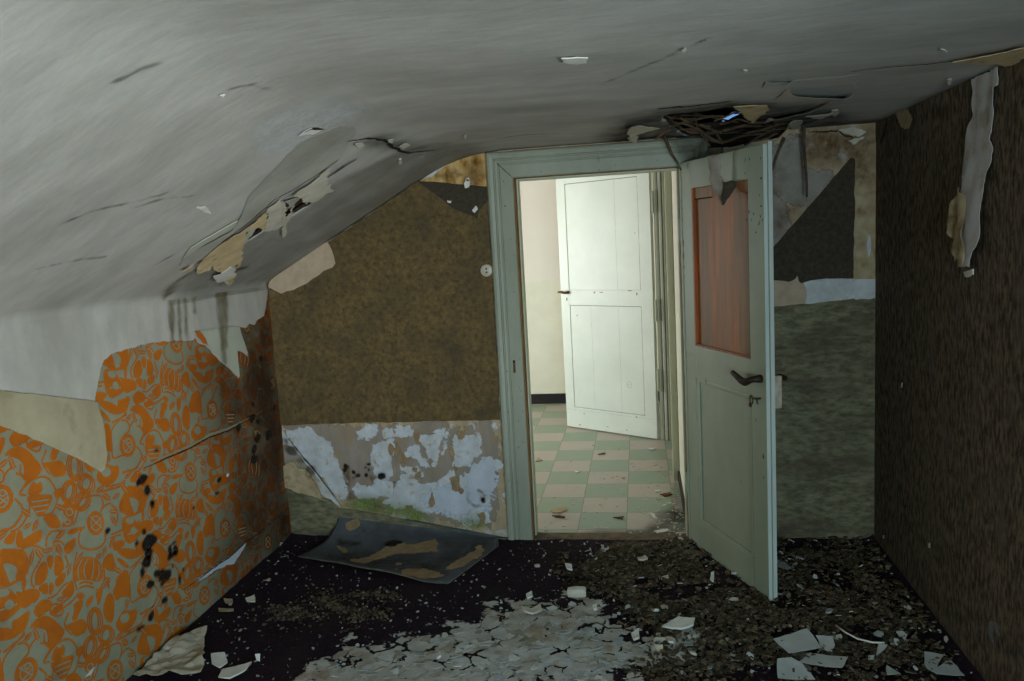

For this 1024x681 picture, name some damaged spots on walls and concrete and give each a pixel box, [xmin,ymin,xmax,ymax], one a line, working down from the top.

peeling [183,169,336,286]
peeling [268,242,335,294]
crack [327,137,434,178]
peeling [772,109,876,307]
peeling [946,67,999,277]
damp [217,292,227,350]
peeling [0,390,107,472]
damp [136,474,154,508]
damp [219,348,278,550]
peeling [282,420,506,536]
damp [135,529,184,631]